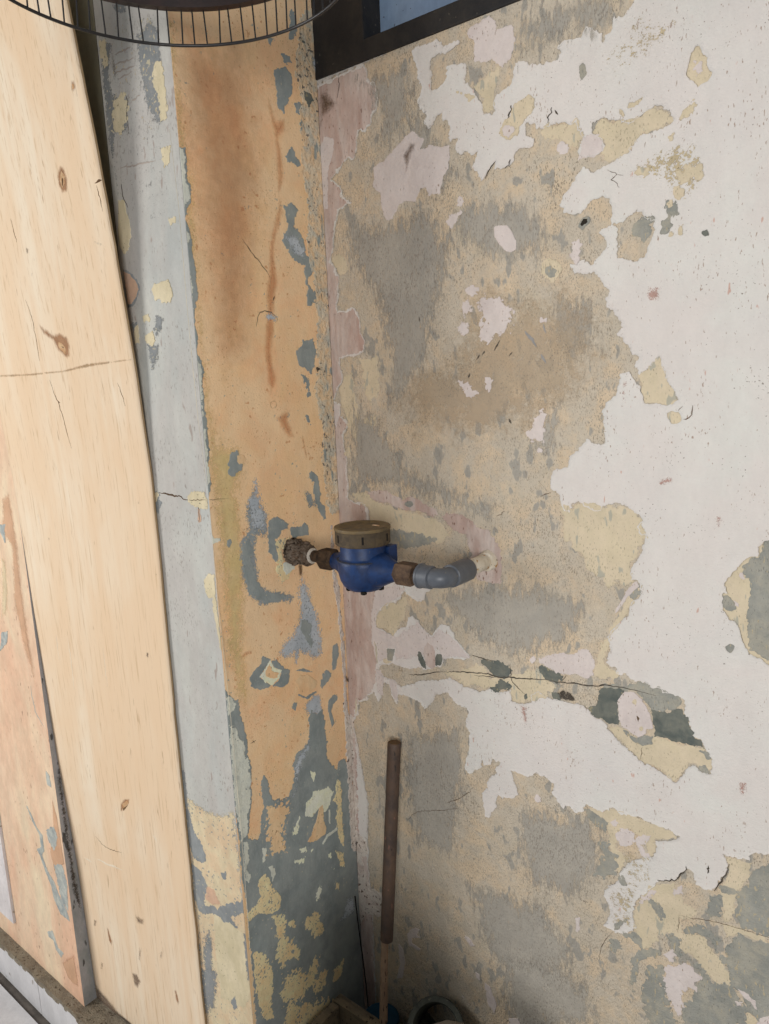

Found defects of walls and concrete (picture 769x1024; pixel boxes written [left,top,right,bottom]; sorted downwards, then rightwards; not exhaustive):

crack [159,492,228,520]
peeling [99,4,365,1024]
peeling [273,0,769,1024]
crack [409,655,655,696]